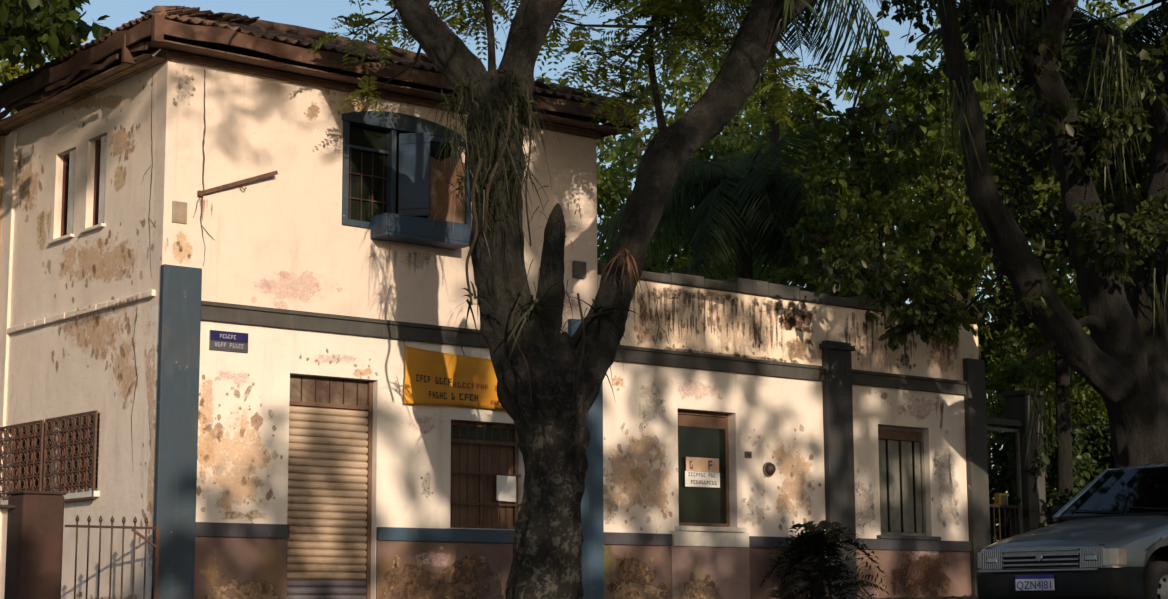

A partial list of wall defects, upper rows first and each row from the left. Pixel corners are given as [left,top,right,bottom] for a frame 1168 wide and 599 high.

peeling [17,145,44,221]
crack [193,69,214,266]
leakage [633,287,816,363]
peeling [43,219,168,567]
peeling [196,374,283,523]
peeling [603,423,678,531]
peeling [763,444,821,530]